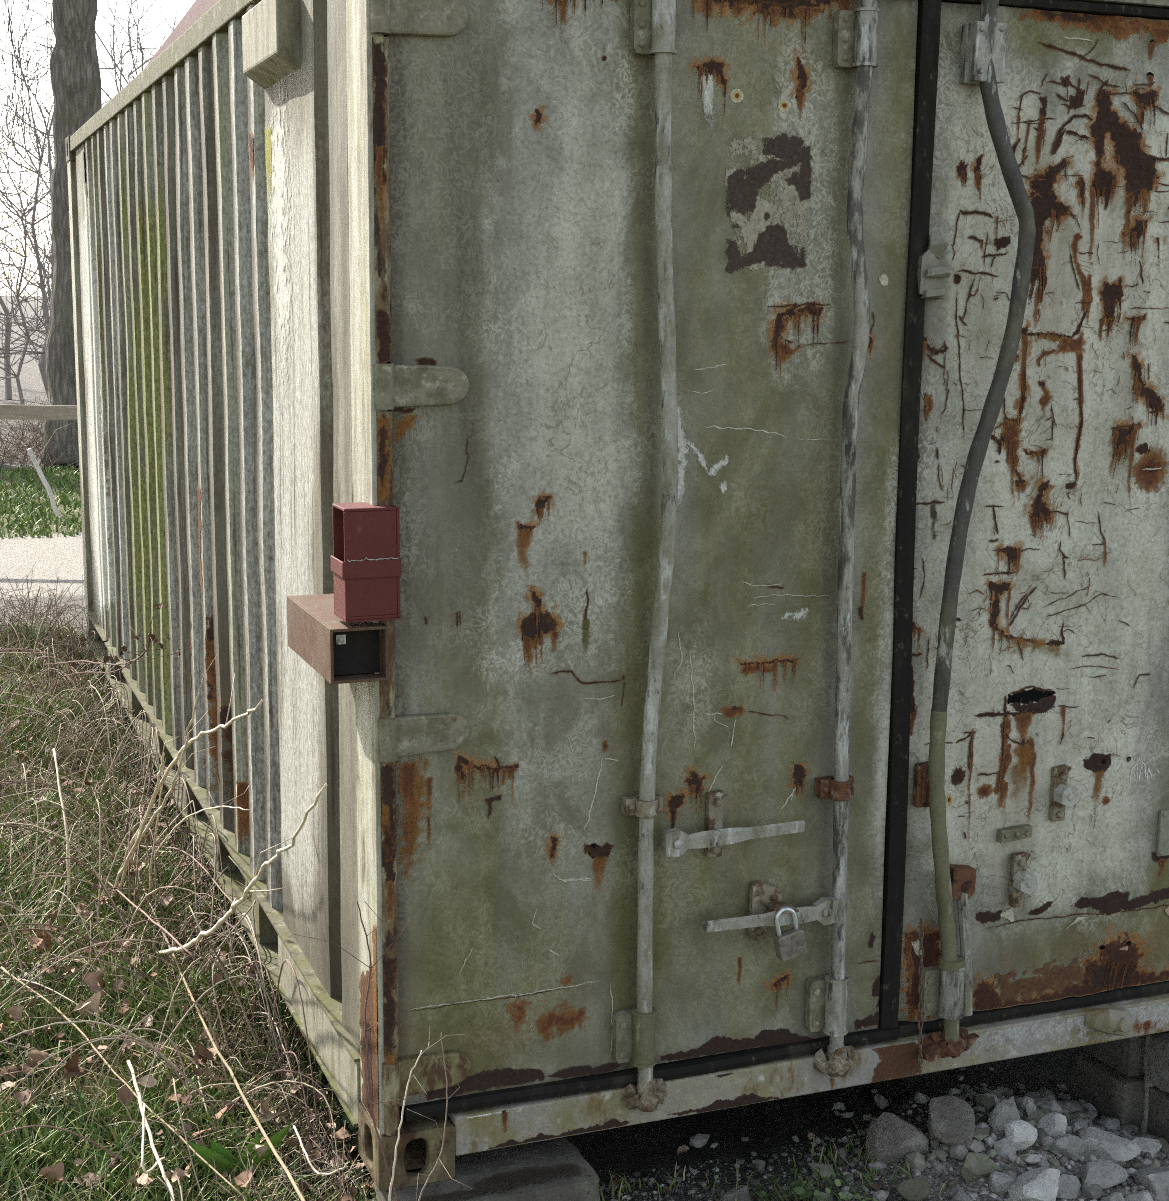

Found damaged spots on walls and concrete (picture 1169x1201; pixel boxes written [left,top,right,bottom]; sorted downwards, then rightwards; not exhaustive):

rust [1019,9,1169,45]
peeling [724,131,813,273]
rust [767,301,849,376]
rust [983,73,1169,661]
rust [516,492,553,568]
rust [517,585,564,665]
rust [190,615,250,846]
rust [454,751,519,820]
rust [959,695,1066,821]
rust [359,756,433,1129]
rust [972,925,1169,1011]
rust [504,997,593,1042]